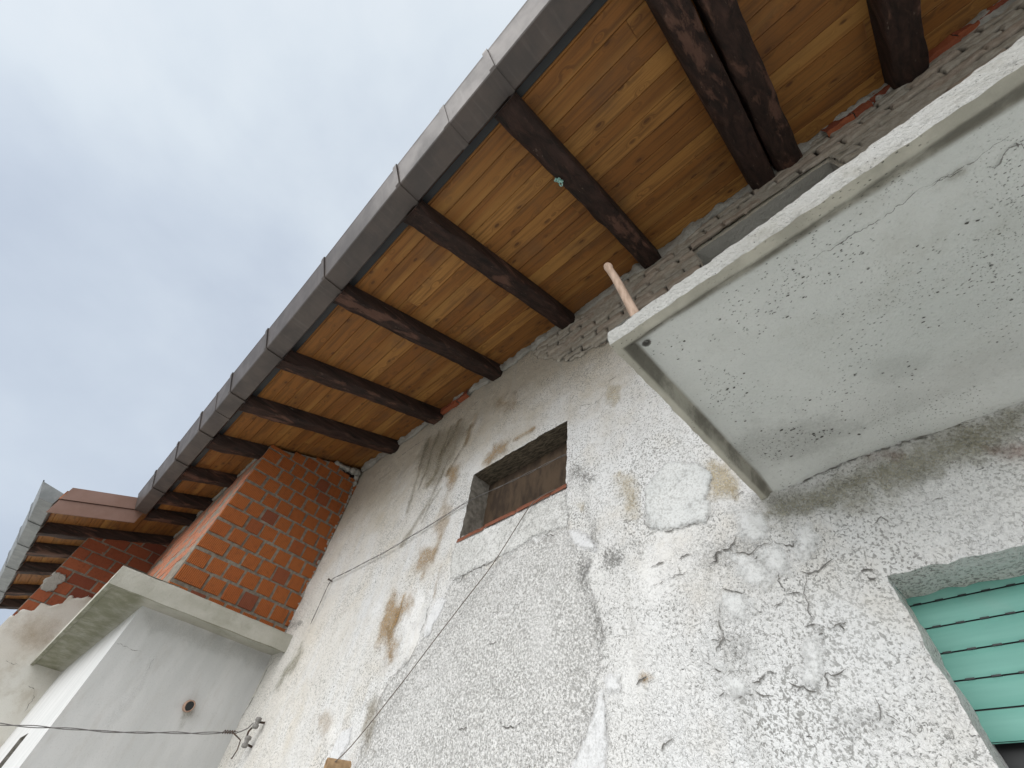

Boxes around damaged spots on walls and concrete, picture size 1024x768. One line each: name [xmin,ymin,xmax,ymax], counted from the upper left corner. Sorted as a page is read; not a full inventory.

crack [828,136,1024,251]
crack [652,537,846,635]
crack [705,588,846,698]